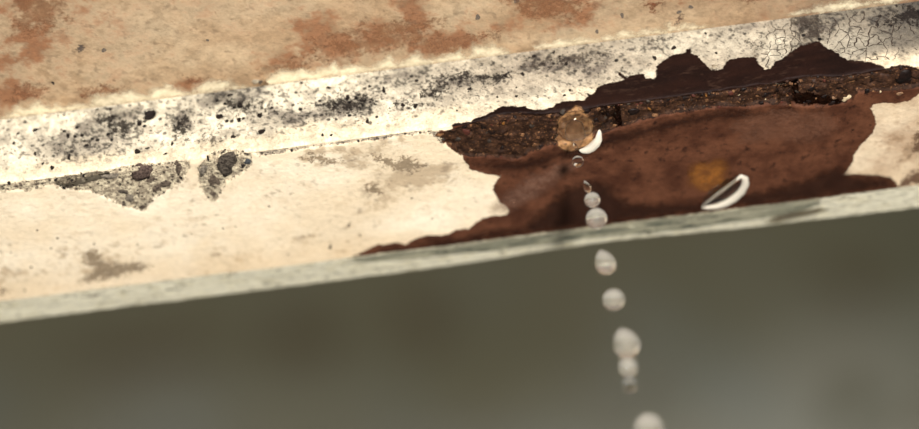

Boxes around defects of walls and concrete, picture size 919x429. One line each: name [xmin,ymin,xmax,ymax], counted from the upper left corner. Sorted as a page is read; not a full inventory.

corrosion [422,30,501,55]
crack [759,23,801,66]
crack [827,12,919,60]
leakage [4,81,277,139]
leakage [162,108,223,147]
spalling [0,66,919,212]
leakage [266,0,919,262]
corrosion [691,161,724,191]